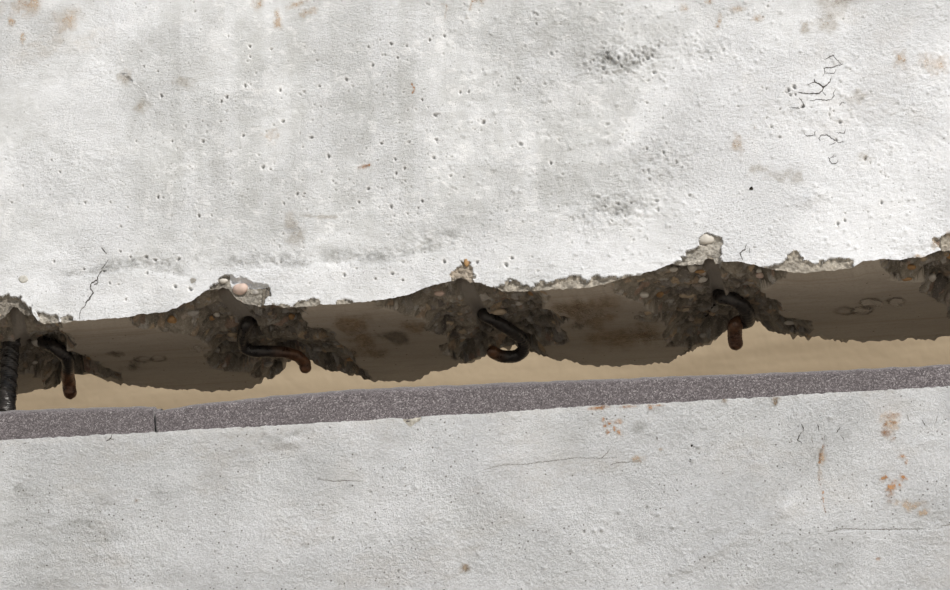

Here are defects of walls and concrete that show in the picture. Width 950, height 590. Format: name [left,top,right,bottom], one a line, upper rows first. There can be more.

crack [791,55,842,109]
spalling [0,294,123,389]
crack [79,249,108,318]
spalling [125,275,371,380]
spalling [373,233,854,364]
spalling [879,234,950,318]